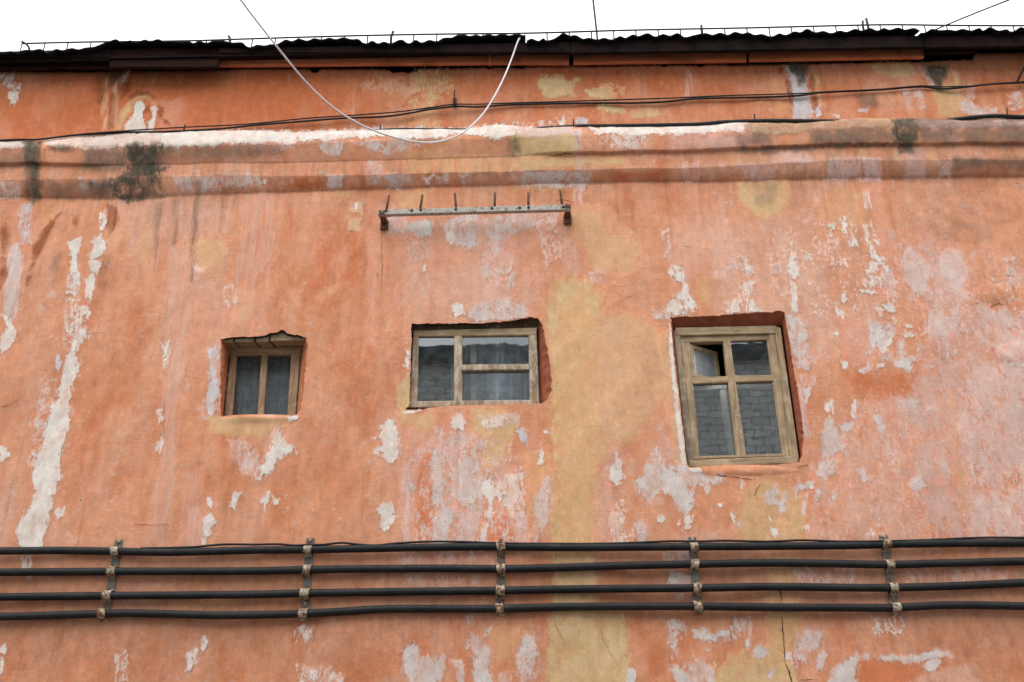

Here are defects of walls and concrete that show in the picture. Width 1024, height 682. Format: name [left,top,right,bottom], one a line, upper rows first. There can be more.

peeling [0,141,25,151]
damp [24,141,41,203]
damp [83,70,170,230]
damp [743,119,1024,183]
peeling [0,181,32,354]
peeling [35,66,1024,545]
peeling [0,446,11,463]
peeling [15,210,108,581]
peeling [515,551,636,682]
peeling [662,551,692,584]
crack [779,591,813,682]
peeling [665,556,983,682]